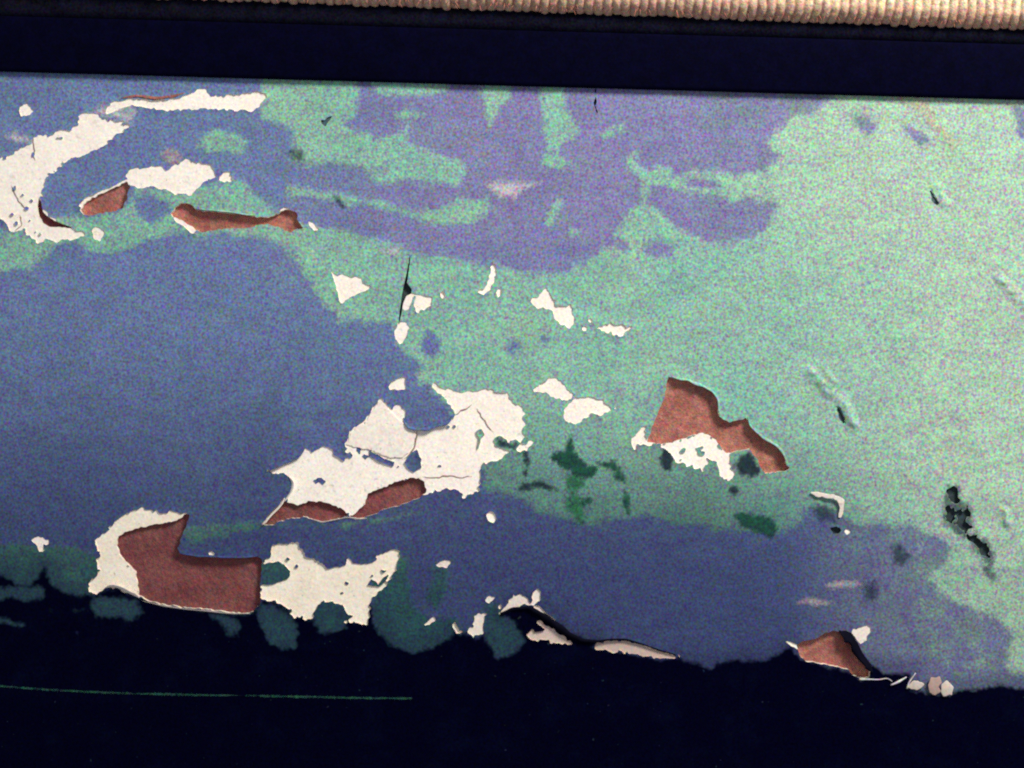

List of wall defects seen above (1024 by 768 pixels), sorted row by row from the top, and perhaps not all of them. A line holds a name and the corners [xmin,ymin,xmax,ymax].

peeling [0,89,319,243]
crack [399,258,412,323]
peeling [394,291,445,344]
peeling [531,288,632,336]
peeling [262,377,534,525]
peeling [534,378,616,424]
spalling [631,376,789,481]
spalling [89,507,400,625]
peeling [453,589,572,645]
peeling [595,640,680,658]
spalling [786,625,873,677]
peeling [908,677,954,697]